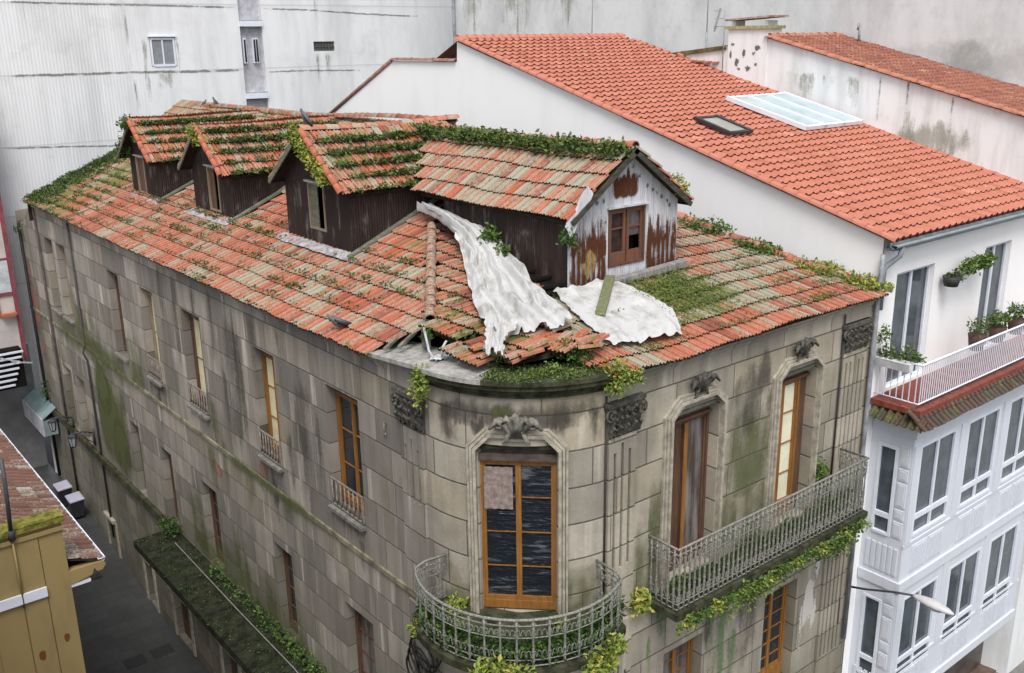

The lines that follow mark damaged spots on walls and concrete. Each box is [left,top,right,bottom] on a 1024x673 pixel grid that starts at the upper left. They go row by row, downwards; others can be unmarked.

flaking render [729,43,760,71]
spalling [468,328,610,361]
leakage [441,400,598,437]